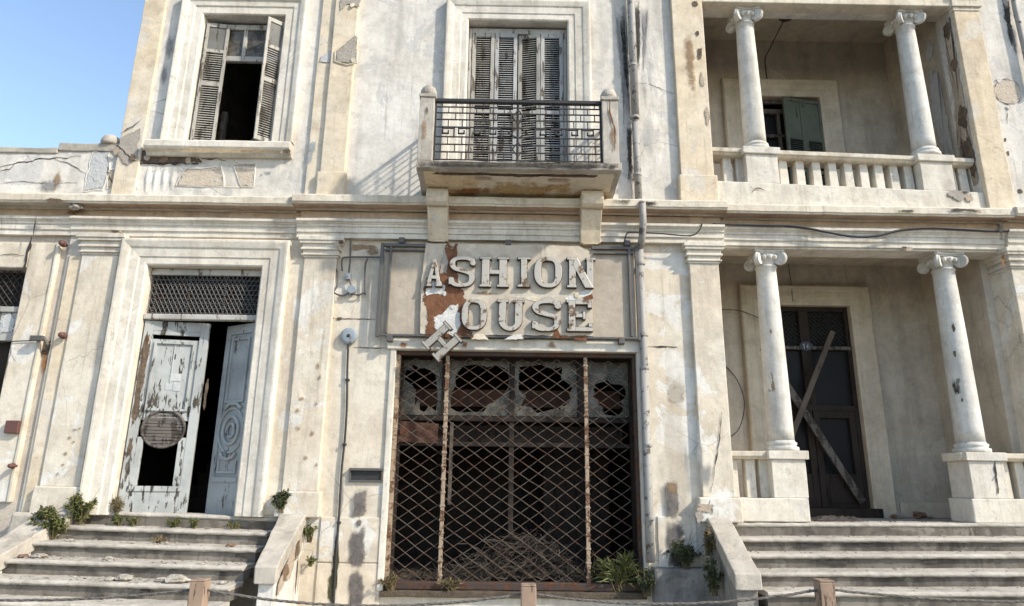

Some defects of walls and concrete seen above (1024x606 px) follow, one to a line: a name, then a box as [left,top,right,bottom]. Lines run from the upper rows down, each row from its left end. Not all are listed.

peeling [320,33,358,66]
damp [617,8,648,110]
flaking render [925,17,980,201]
peeling [993,77,1022,123]
crack [1,156,85,191]
peeling [83,122,257,193]
crack [709,414,722,504]
damp [340,480,367,604]